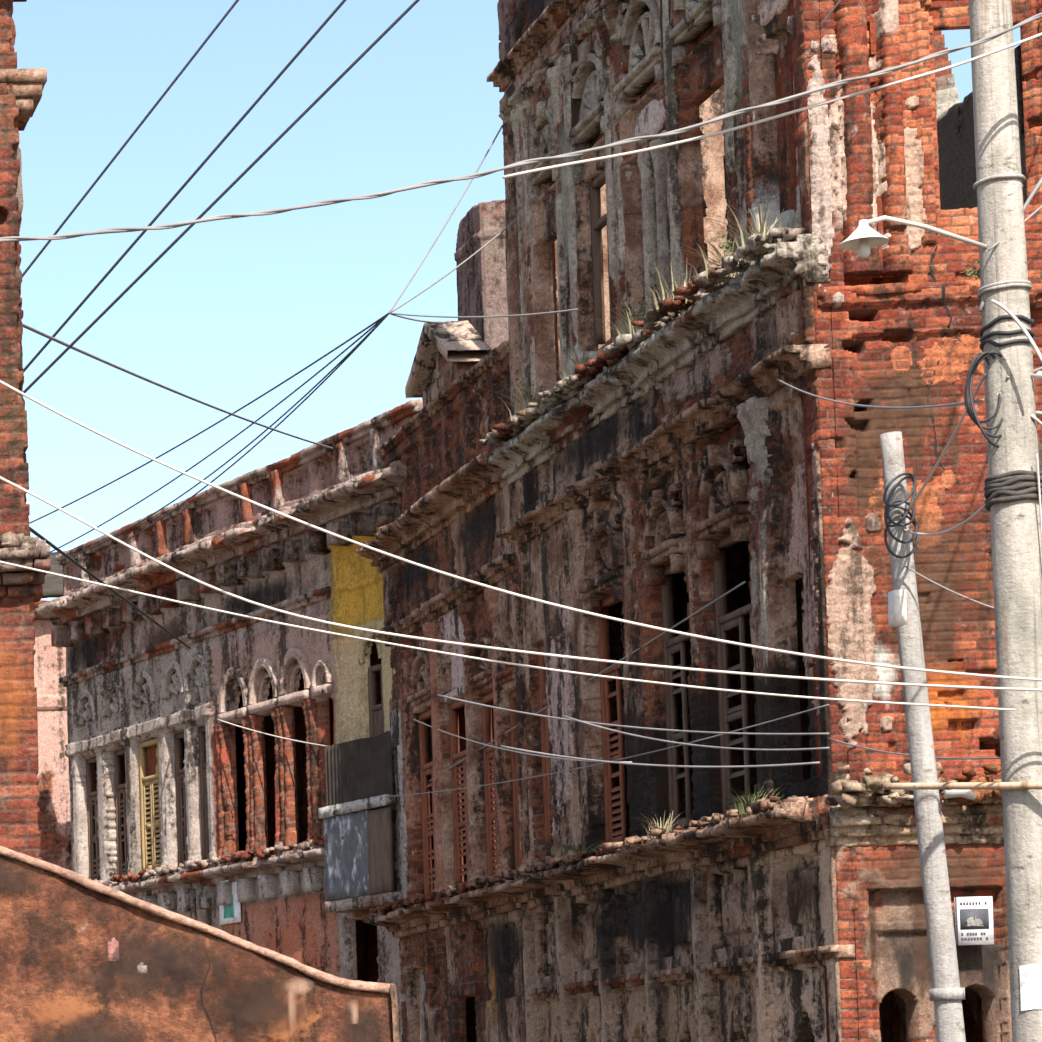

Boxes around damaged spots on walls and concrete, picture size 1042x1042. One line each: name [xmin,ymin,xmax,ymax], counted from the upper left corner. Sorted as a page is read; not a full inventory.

water stain [515,0,544,42]
flaking render [807,35,847,308]
flaking render [868,55,891,251]
spalling [907,470,956,551]
flaking render [787,462,893,750]
water stain [35,1016,143,1042]
water stain [59,934,305,1042]
water stain [338,1004,380,1042]
water stain [485,923,524,1003]
water stain [597,873,693,987]
water stain [773,873,820,953]